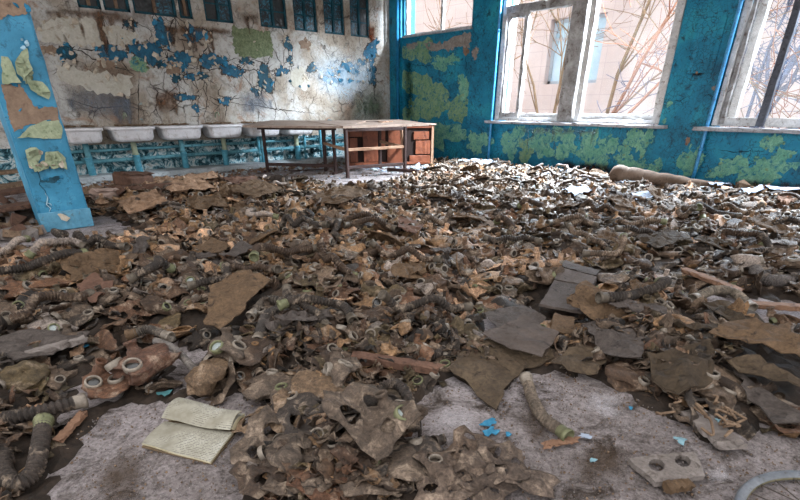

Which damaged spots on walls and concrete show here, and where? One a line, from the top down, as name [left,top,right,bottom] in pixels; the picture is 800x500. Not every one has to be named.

crack [72,44,317,122]
peeling [40,6,382,125]
flaking render [406,32,479,61]
flaking render [371,155,520,179]
flaking render [525,147,608,190]